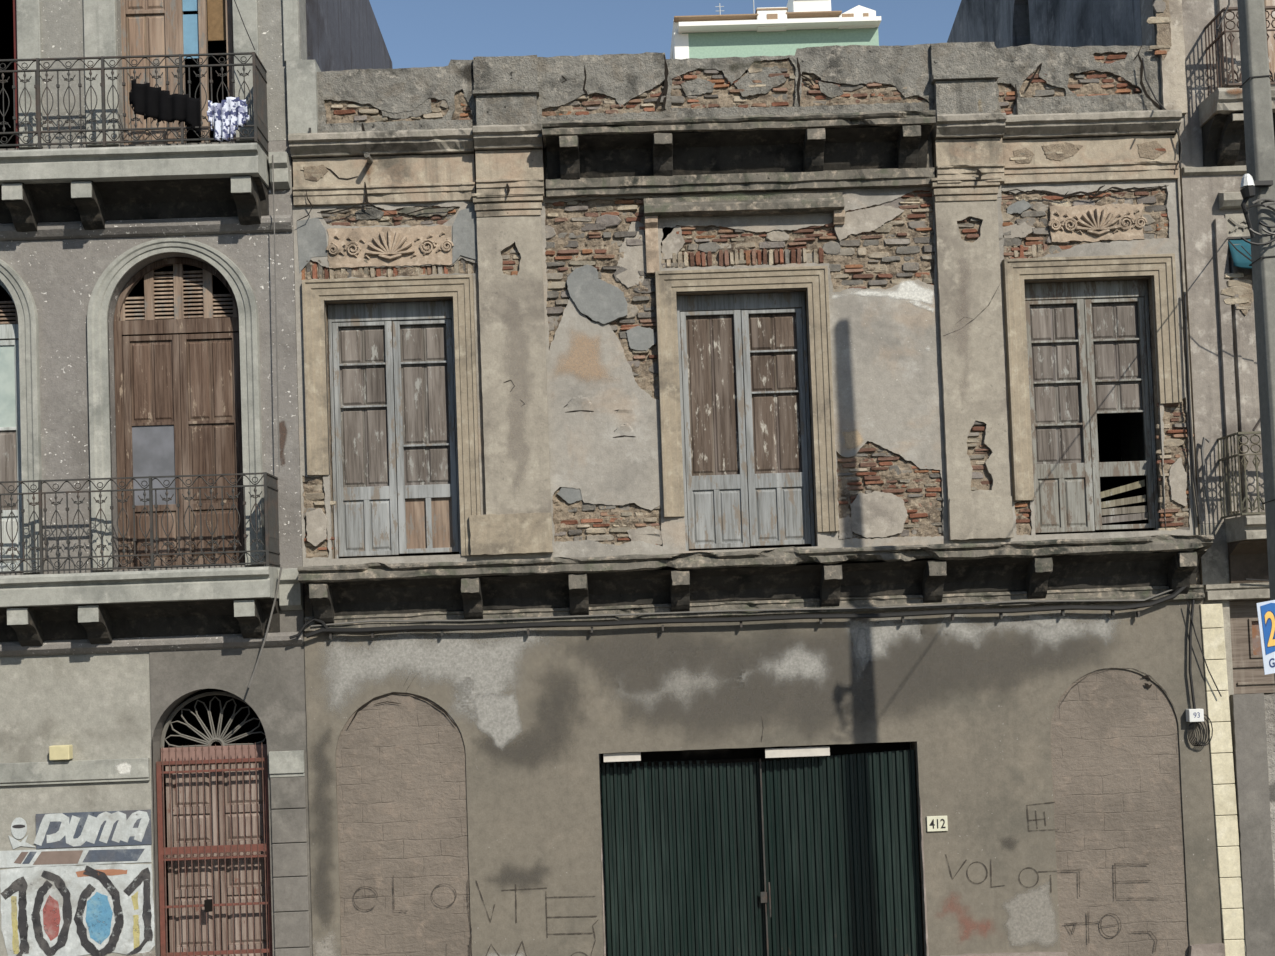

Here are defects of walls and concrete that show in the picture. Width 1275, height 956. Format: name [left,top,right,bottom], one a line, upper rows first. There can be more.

flaking render [542,58,928,117]
flaking render [997,53,1141,115]
flaking render [321,205,460,227]
flaking render [957,218,982,243]
flaking render [999,185,1169,259]
flaking render [545,190,935,400]
flaking render [552,487,663,546]
flaking render [830,441,943,539]
flaking render [967,421,992,491]
flaking render [1155,398,1198,531]
leakage [325,629,572,763]
leakage [585,613,1115,726]